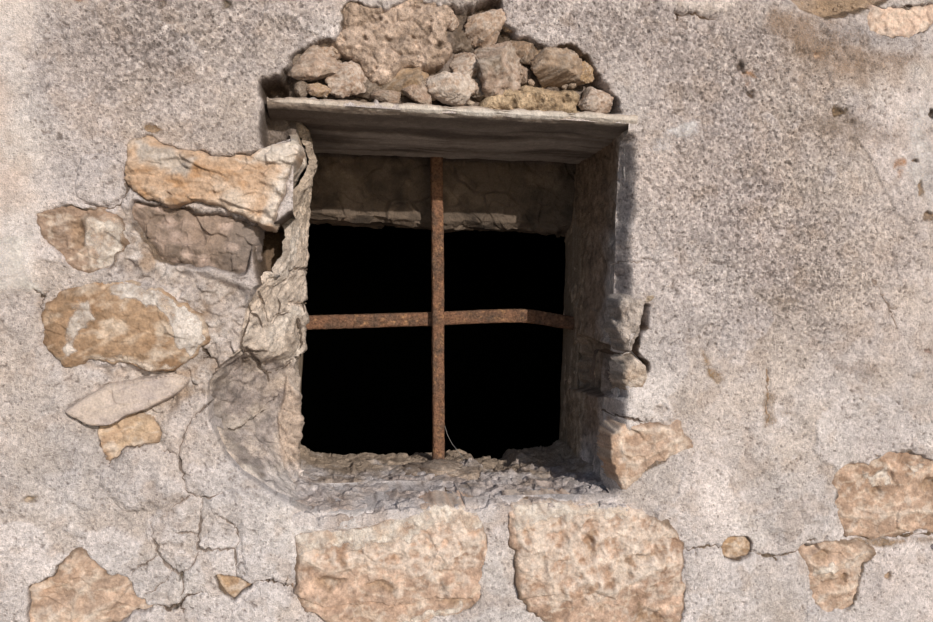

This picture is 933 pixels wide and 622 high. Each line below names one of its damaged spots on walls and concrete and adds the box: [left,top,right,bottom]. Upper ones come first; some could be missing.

spalling [283,0,614,121]
spalling [816,0,933,38]
spalling [37,124,307,461]
crack [202,346,218,375]
crack [226,293,306,430]
spalling [29,547,153,622]
crack [132,398,291,613]
spalling [291,490,487,622]
spalling [501,487,686,622]
spalling [596,415,693,490]
spalling [798,449,933,612]